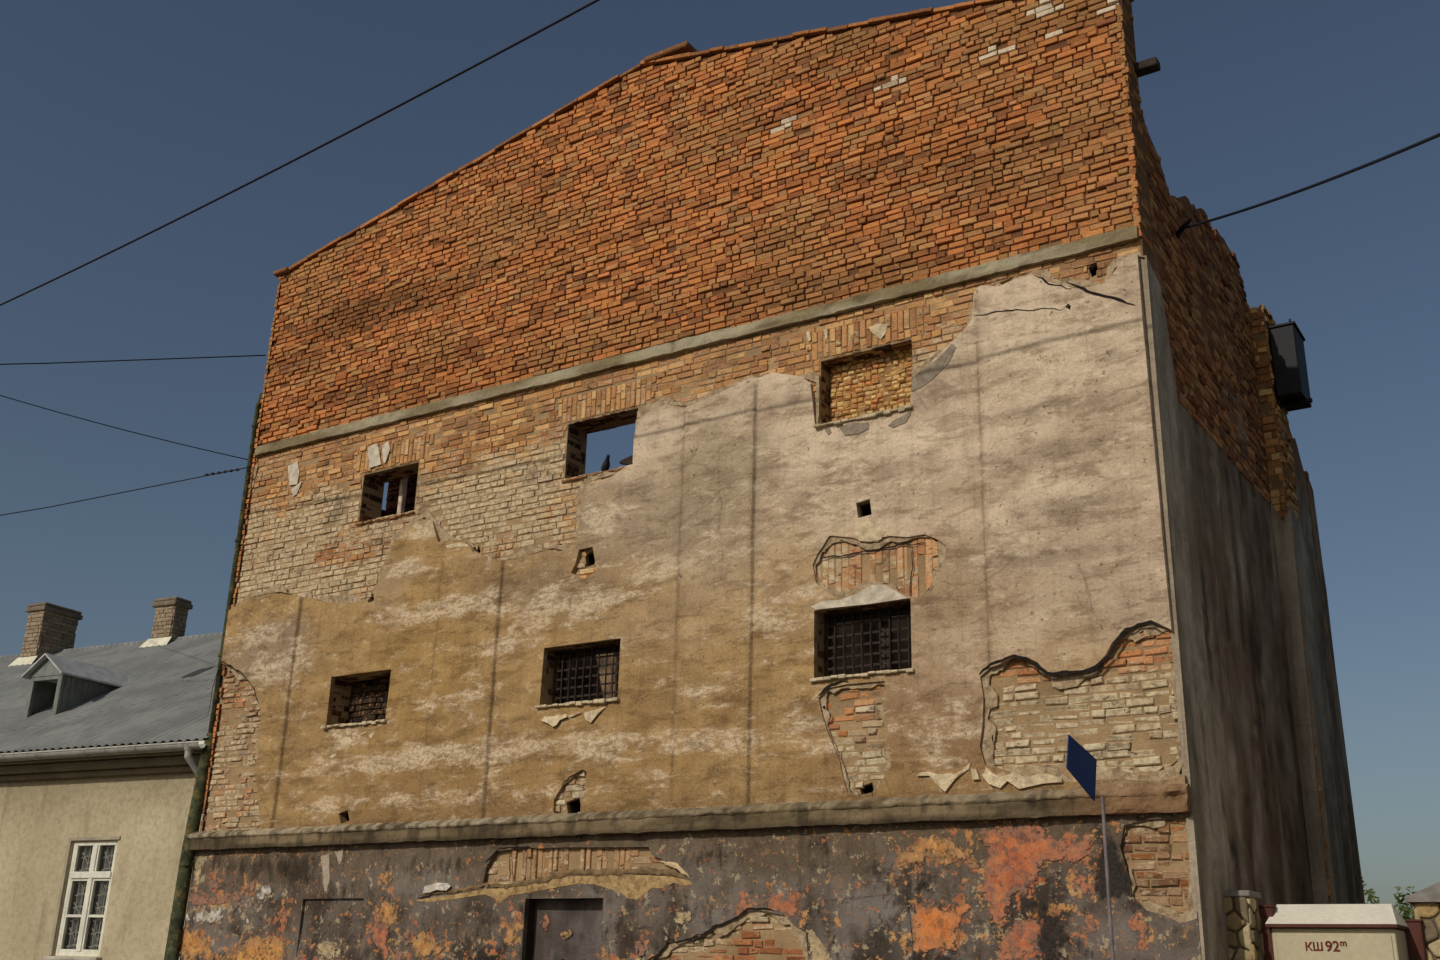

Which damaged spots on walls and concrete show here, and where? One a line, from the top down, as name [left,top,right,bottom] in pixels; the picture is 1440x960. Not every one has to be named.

crack [974,276,1135,316]
spalling [234,238,1145,607]
spalling [917,621,1188,792]
spalling [203,664,261,832]
spalling [820,681,891,795]
water stain [321,850,343,894]
peeling [413,847,693,902]
water stain [1094,842,1132,900]
water stain [469,947,493,960]
crack [648,907,775,960]
spalling [634,892,832,960]
mould [1011,899,1069,960]